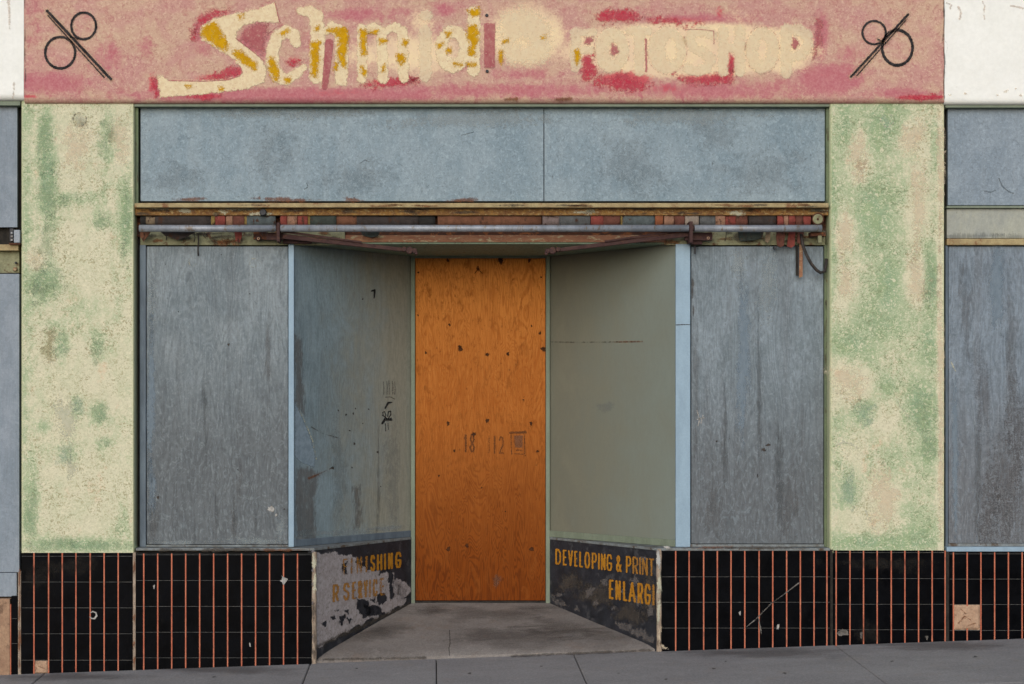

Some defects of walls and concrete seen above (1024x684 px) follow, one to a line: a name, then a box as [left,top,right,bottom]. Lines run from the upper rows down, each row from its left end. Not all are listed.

peeling [191,8,235,41]
peeling [240,22,269,56]
peeling [597,8,701,27]
peeling [203,66,238,80]
peeling [363,76,420,90]
peeling [580,54,654,92]
peeling [671,53,736,86]
rust [214,197,305,216]
rust [184,232,252,245]
peeling [311,550,411,656]
crack [749,582,800,631]
spalling [954,605,980,630]